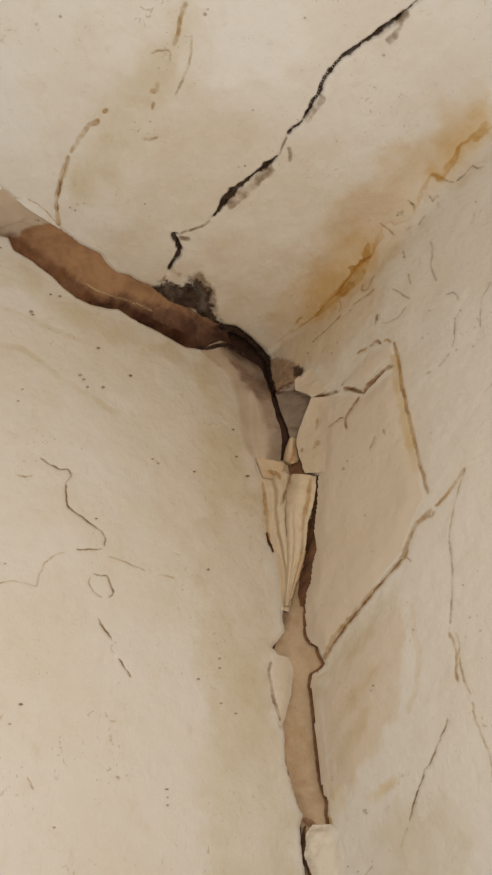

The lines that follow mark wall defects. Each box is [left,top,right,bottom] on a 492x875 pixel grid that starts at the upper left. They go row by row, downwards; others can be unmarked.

crack [287,1,416,134]
crack [213,155,278,216]
spalling [0,188,232,349]
crack [168,232,182,270]
water stain [152,279,219,323]
crack [317,372,383,427]
crack [306,473,318,553]
spalling [255,356,345,875]
crack [300,594,342,875]